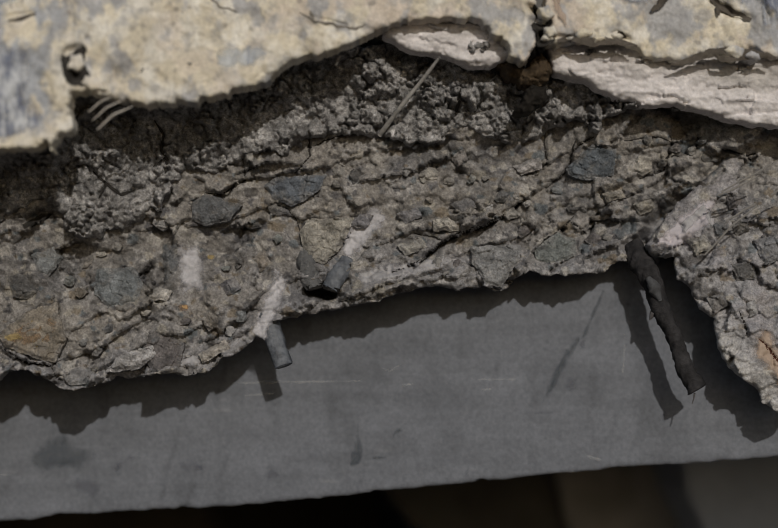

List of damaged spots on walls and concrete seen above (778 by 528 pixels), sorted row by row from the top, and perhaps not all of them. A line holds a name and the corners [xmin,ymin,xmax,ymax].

spalling [61,44,107,91]
spalling [359,34,384,47]
spalling [0,107,778,413]
corrosion [625,238,706,404]
corrosion [757,330,778,384]